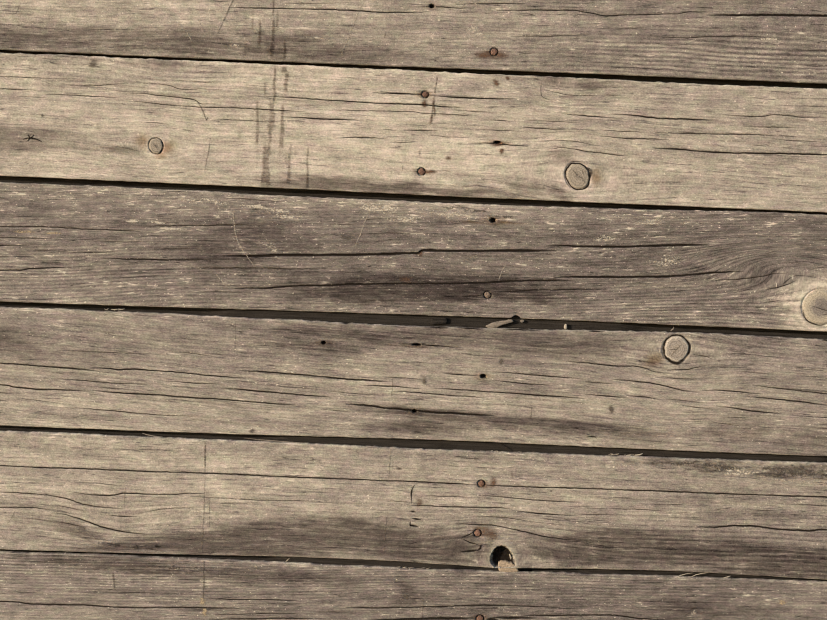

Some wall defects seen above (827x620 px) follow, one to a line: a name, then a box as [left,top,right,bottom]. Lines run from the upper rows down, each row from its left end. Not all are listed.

crack [3,76,113,98]
crack [135,81,827,190]
crack [0,224,791,302]
crack [0,465,827,552]